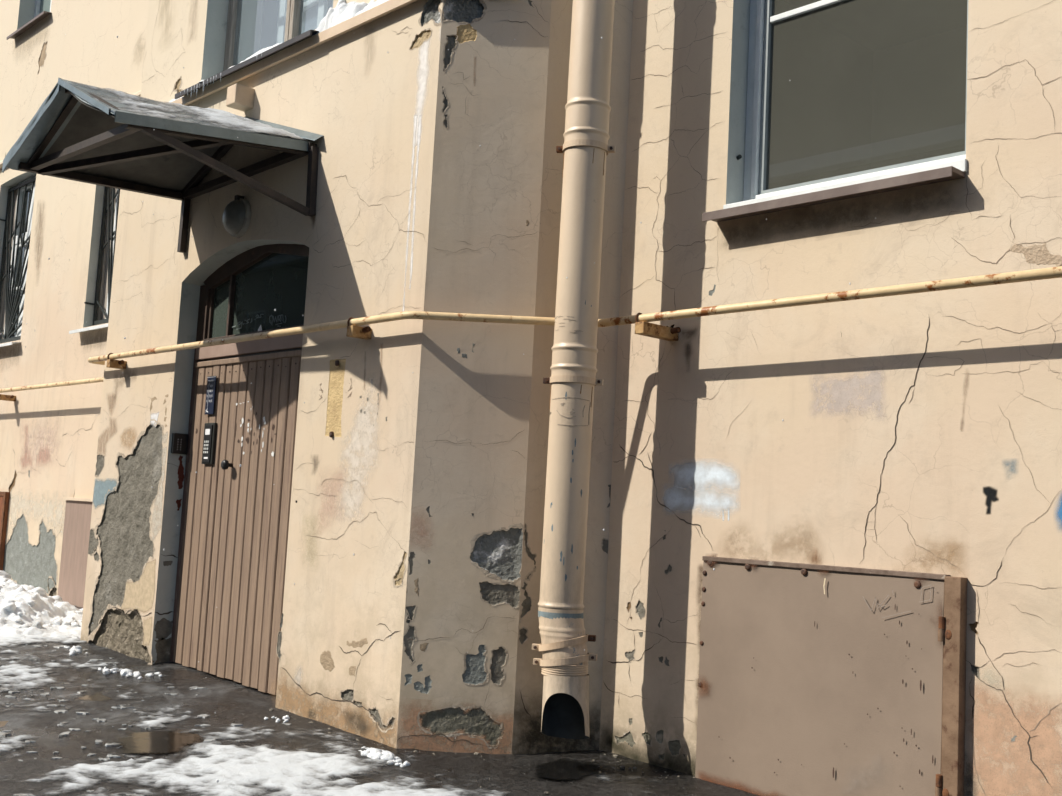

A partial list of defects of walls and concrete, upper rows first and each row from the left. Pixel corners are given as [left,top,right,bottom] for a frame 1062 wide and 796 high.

flaking render [409,0,487,72]
leakage [403,35,441,311]
crack [624,1,726,310]
crack [856,59,1062,264]
flaking render [3,512,58,596]
flaking render [87,394,173,665]
crack [283,616,515,747]
flaking render [393,551,432,694]
flaking render [417,704,504,749]
flaking render [470,523,537,645]
crack [603,343,735,723]
crack [859,312,1062,795]